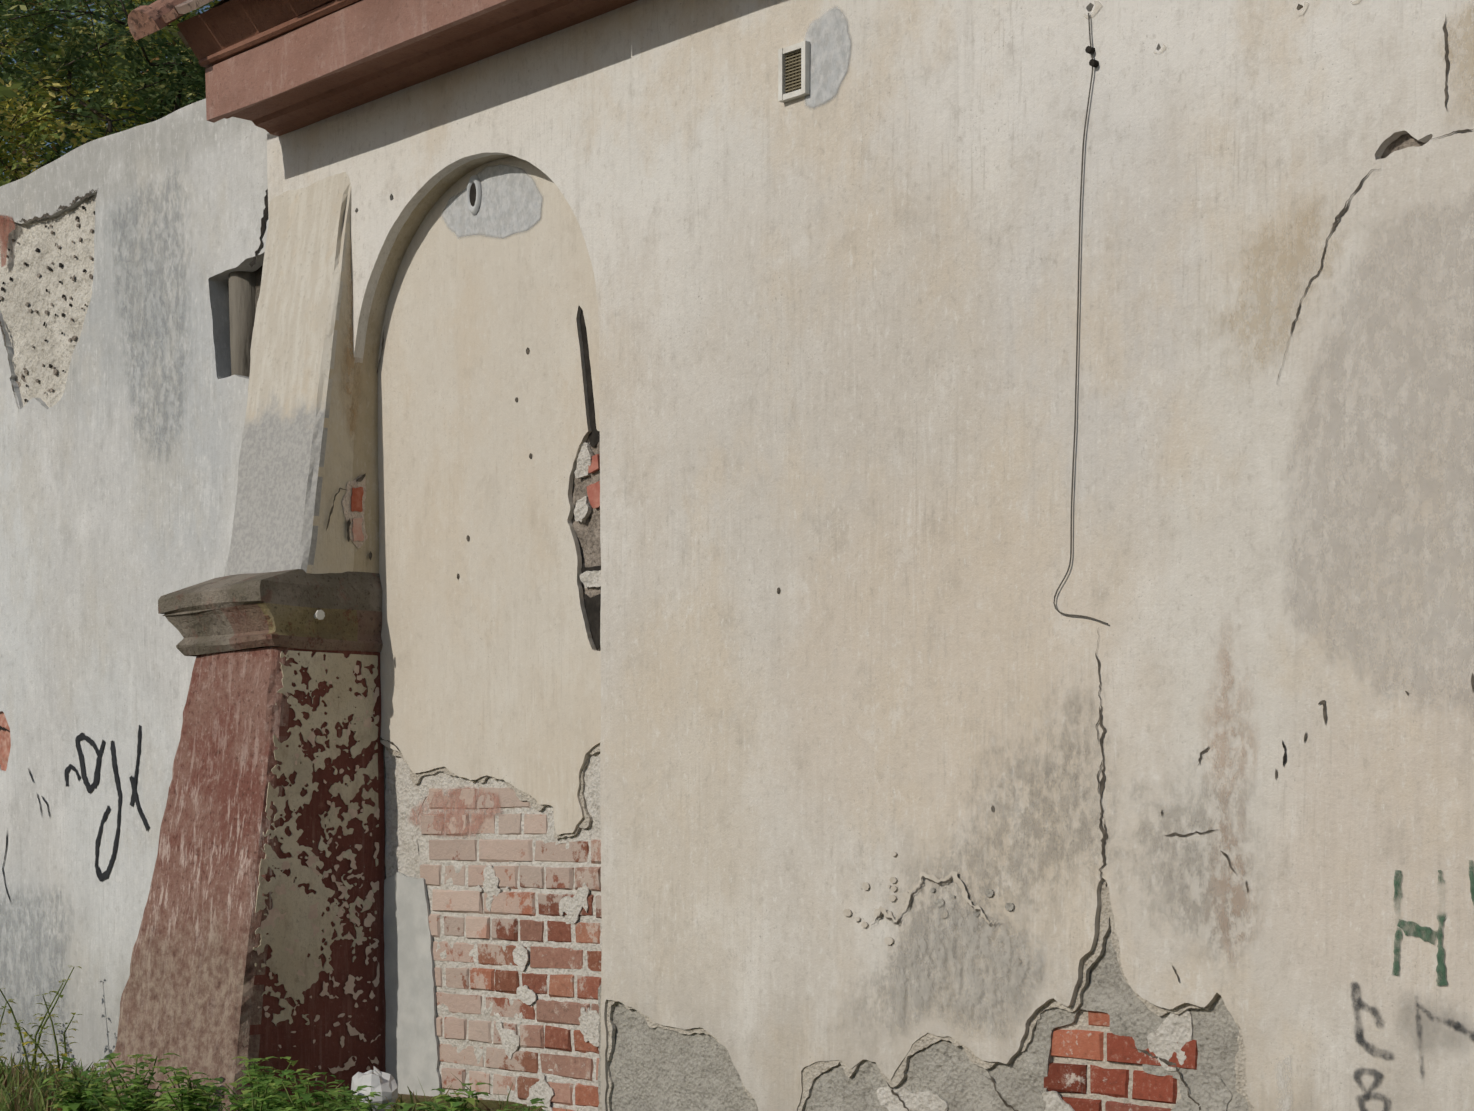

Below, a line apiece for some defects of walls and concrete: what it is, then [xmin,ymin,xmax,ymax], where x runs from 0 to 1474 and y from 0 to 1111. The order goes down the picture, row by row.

crack [1433,14,1473,139]
spalling [0,194,97,408]
crack [1278,169,1377,376]
flaking render [326,473,372,561]
spalling [572,436,601,651]
flaking render [0,712,11,771]
crack [1095,630,1107,880]
flaking render [253,650,758,1111]
spalling [797,879,1255,1111]